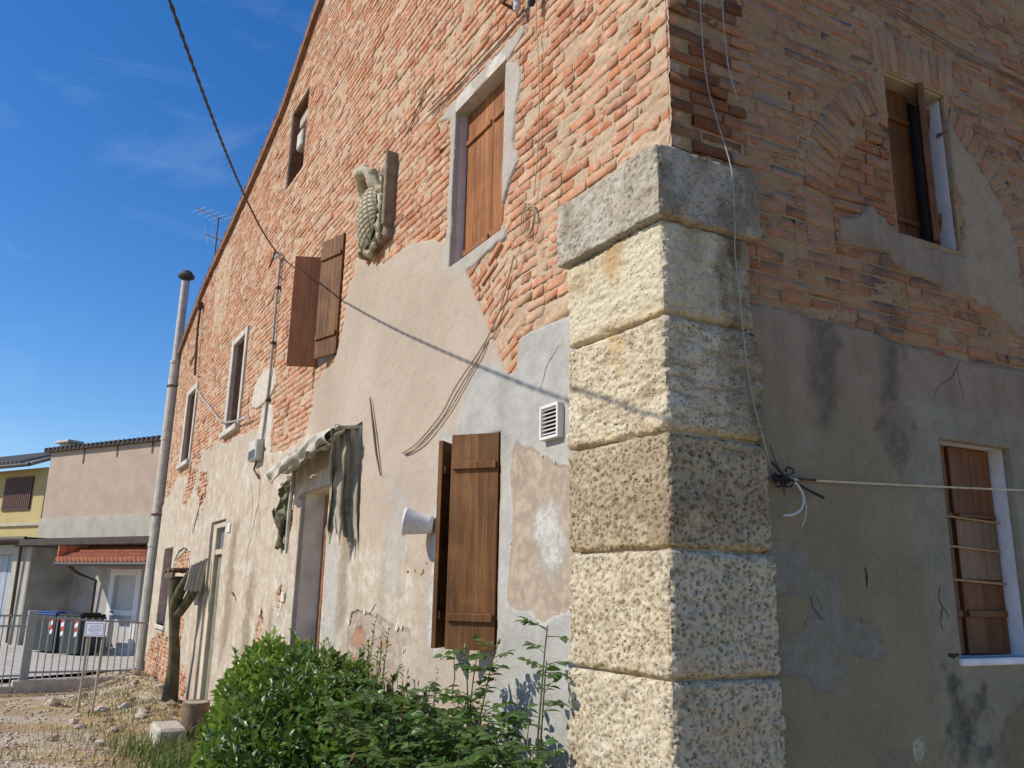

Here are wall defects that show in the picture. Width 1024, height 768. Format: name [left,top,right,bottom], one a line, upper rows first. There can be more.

spalling [183,433,208,511]
peeling [507,443,581,621]
spalling [144,616,186,701]
peeling [347,608,410,694]